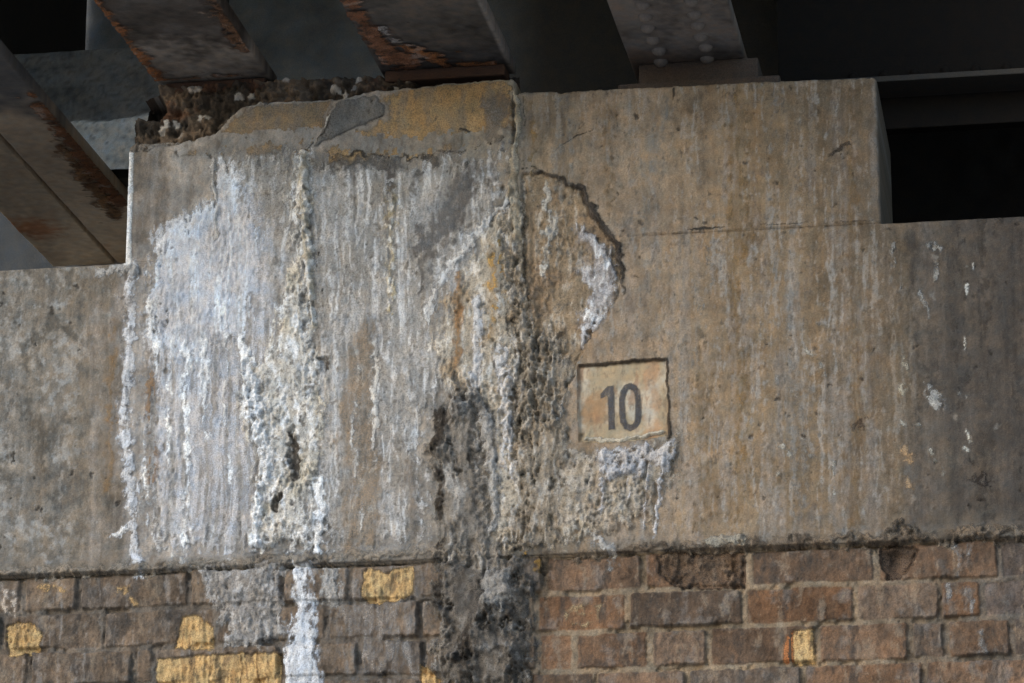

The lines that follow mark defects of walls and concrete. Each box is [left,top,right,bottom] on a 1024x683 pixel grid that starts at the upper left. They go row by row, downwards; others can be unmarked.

corrosion [339,0,497,70]
corrosion [16,92,128,221]
leakage [124,152,134,266]
peeling [308,95,384,148]
spalling [520,171,626,400]
leakage [129,142,682,600]